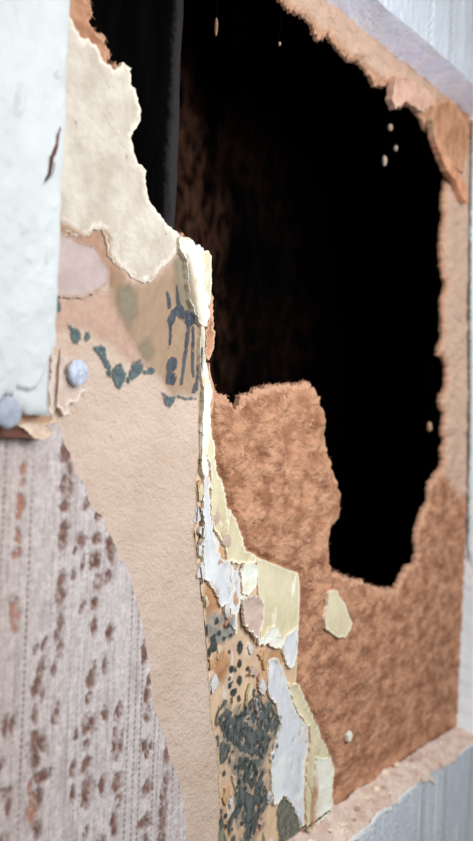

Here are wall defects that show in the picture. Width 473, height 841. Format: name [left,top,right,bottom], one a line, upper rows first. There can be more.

spalling [57,233,110,299]
water stain [57,223,203,407]
peeling [177,237,473,841]
mould [206,614,303,841]